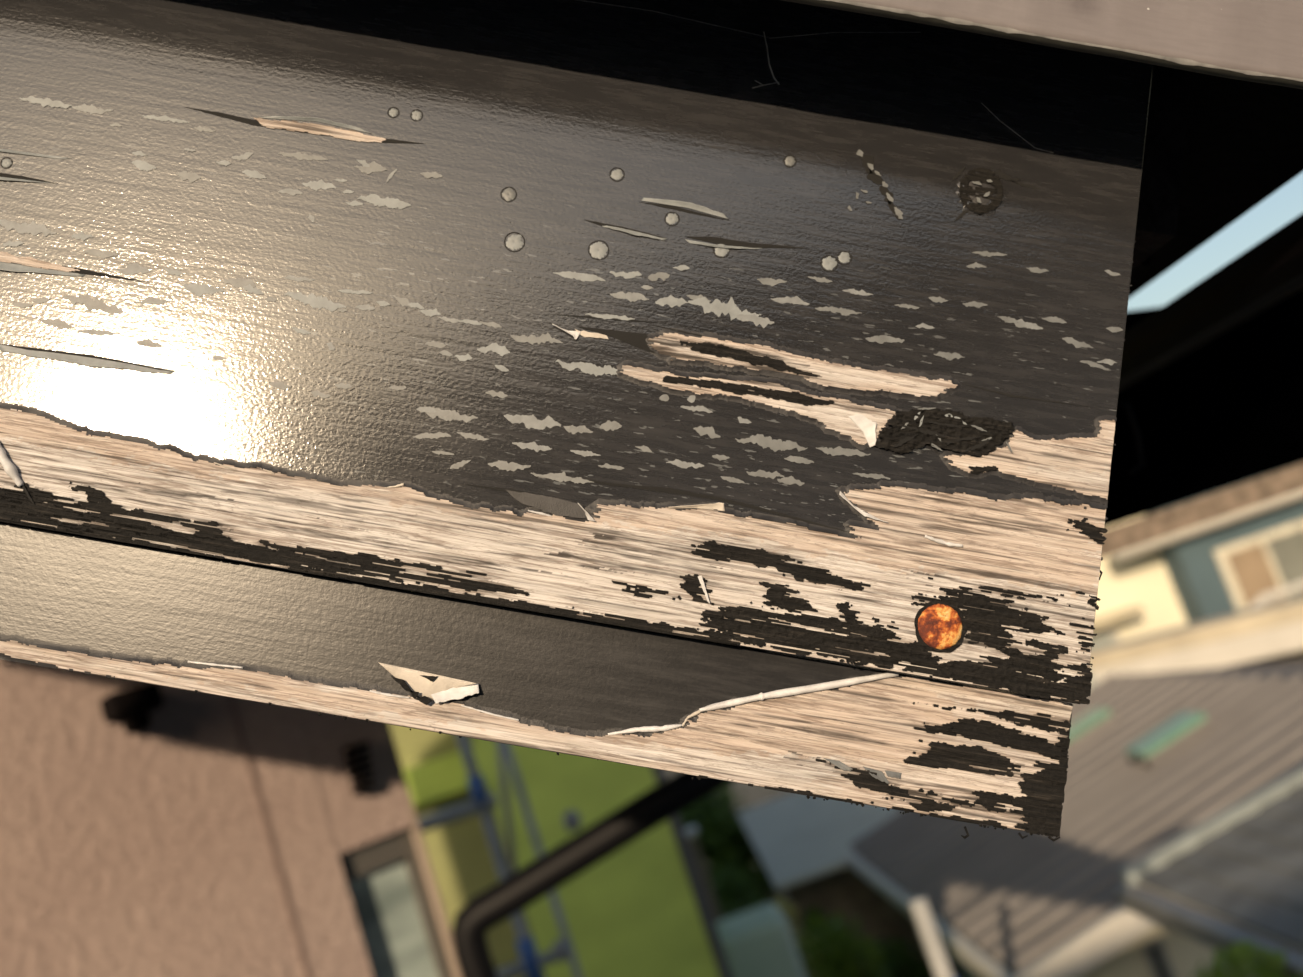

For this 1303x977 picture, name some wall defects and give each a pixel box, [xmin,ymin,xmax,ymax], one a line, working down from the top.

peeling [142,115,215,132]
peeling [216,152,267,179]
peeling [278,152,328,161]
peeling [278,160,411,209]
peeling [0,219,1117,838]